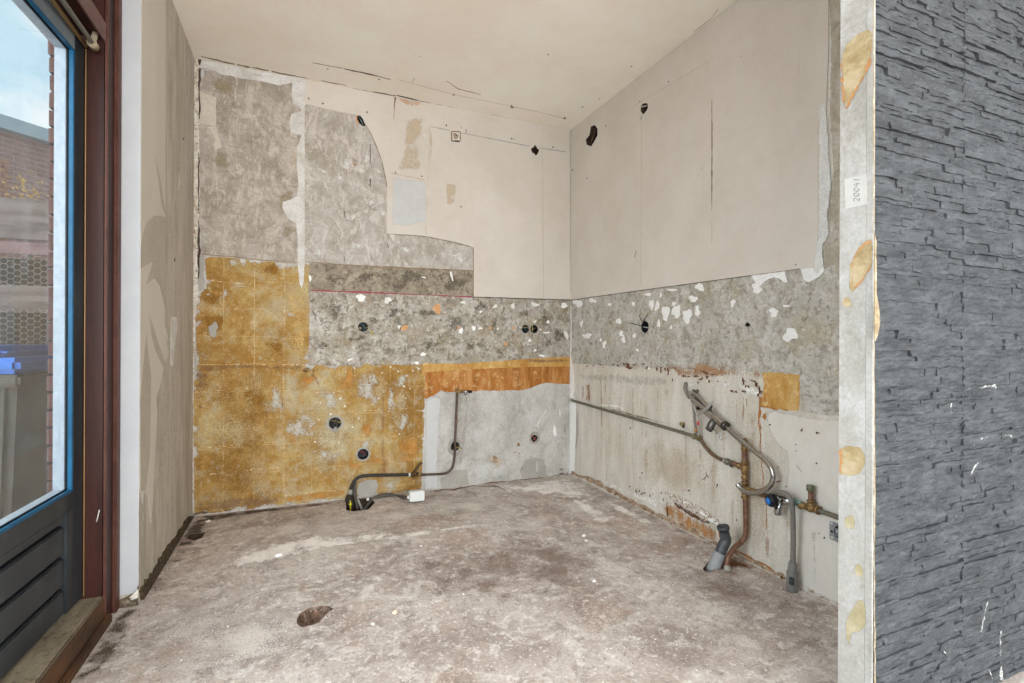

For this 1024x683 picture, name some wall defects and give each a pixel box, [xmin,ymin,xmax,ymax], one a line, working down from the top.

peeling [208,322,218,337]
peeling [270,352,426,481]
corrosion [736,396,778,485]
spalling [570,471,720,545]
spalling [734,551,786,580]